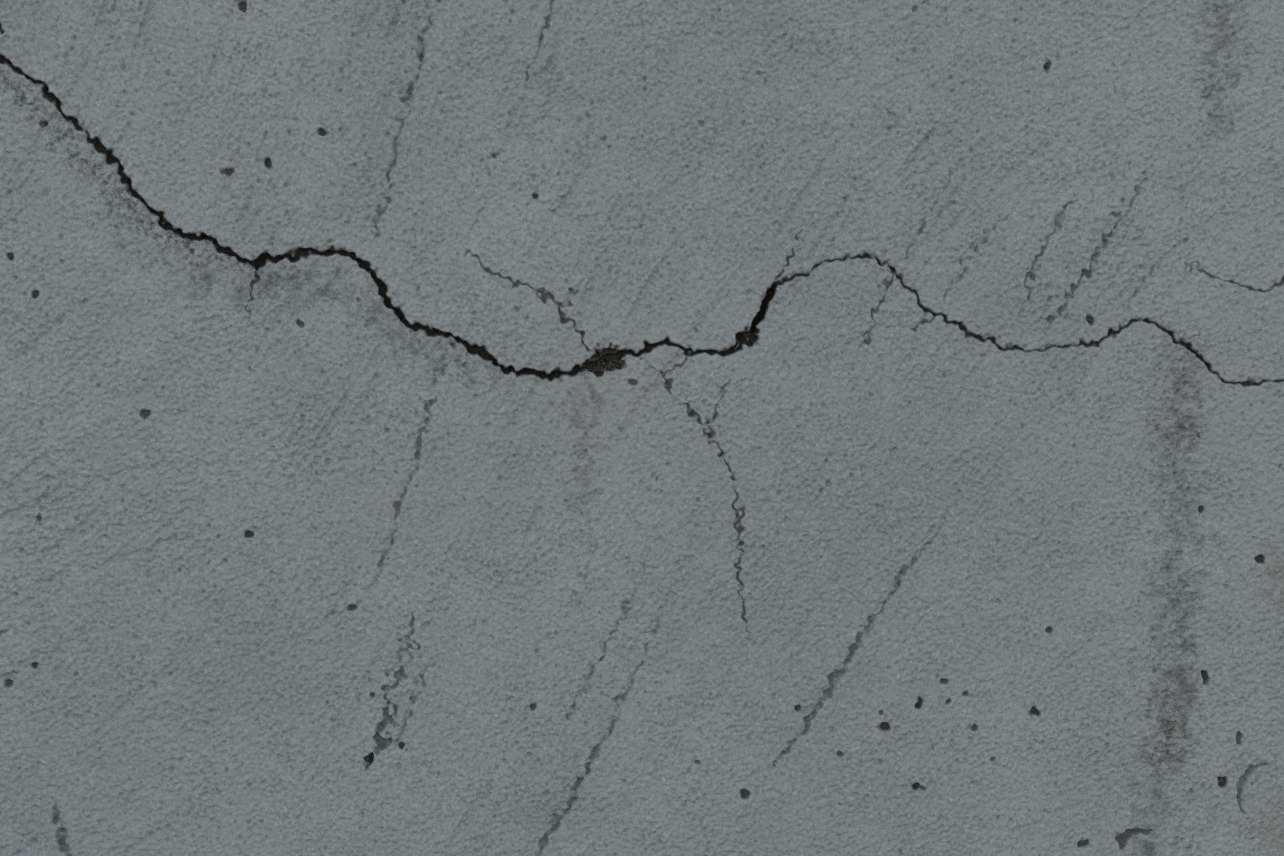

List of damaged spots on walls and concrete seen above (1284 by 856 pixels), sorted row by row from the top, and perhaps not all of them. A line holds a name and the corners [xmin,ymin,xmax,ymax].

crack [0,55,1284,631]